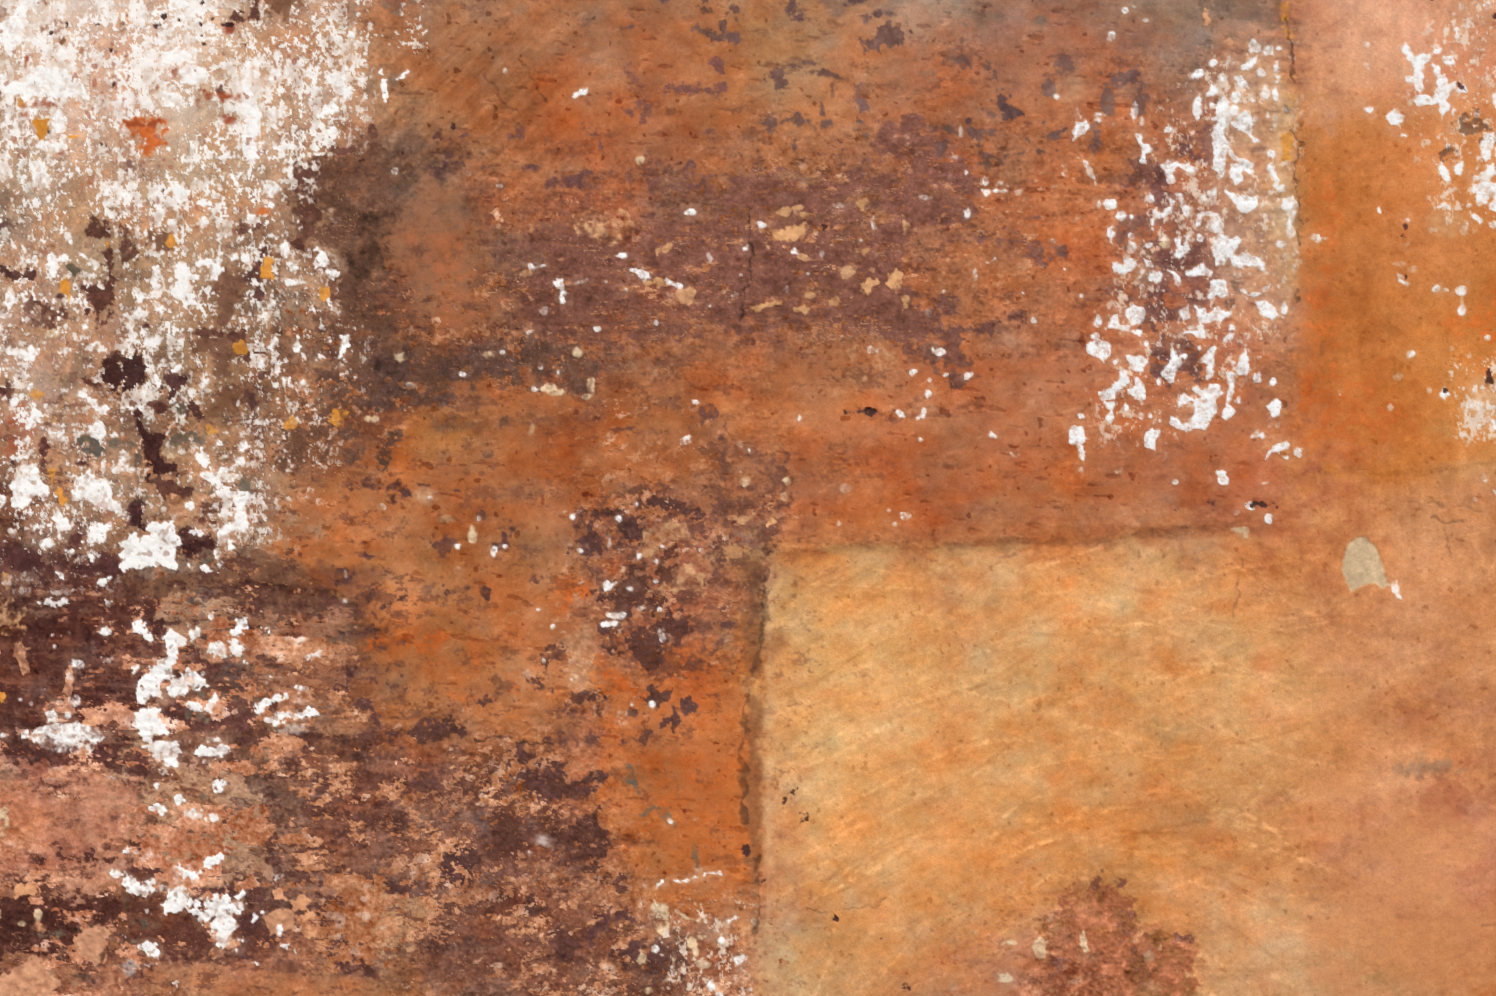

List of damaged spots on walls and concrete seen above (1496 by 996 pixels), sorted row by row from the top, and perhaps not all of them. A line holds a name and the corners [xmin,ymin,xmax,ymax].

leakage [0,148,276,477]
rust [381,209,499,339]
peeling [1046,4,1329,474]
rust [1280,120,1496,474]
peeling [1363,0,1496,288]
leakage [314,547,500,751]
leakage [428,533,459,561]
peeling [0,0,1070,996]
rust [551,571,592,618]
rust [665,642,737,714]
leakage [0,863,279,989]
flaking render [996,868,1205,996]